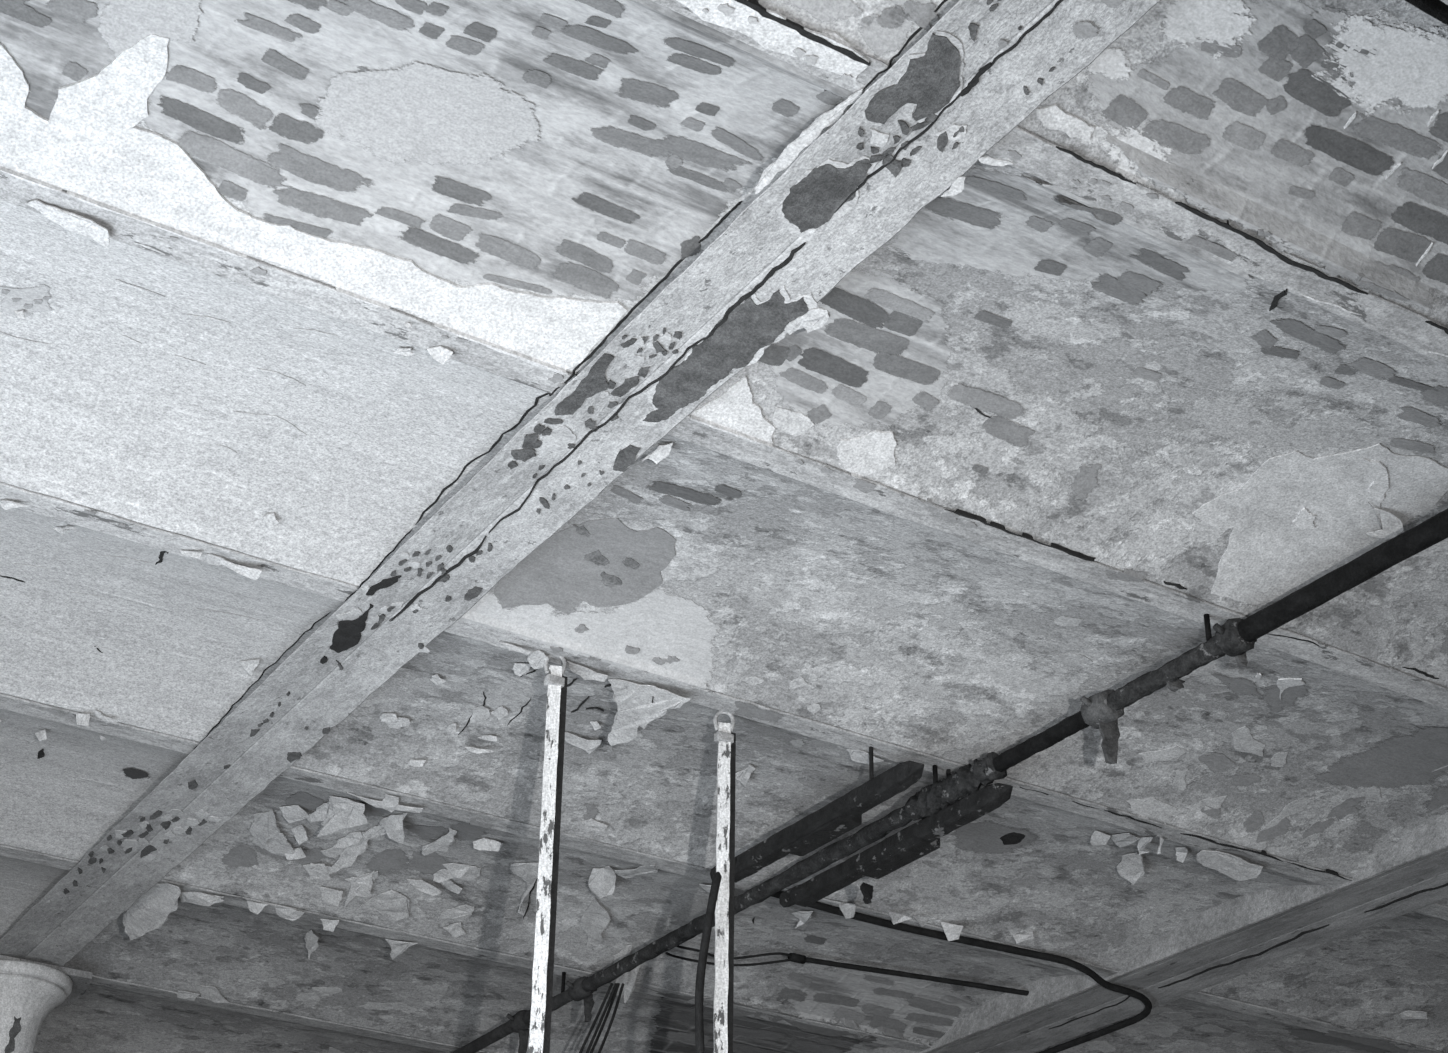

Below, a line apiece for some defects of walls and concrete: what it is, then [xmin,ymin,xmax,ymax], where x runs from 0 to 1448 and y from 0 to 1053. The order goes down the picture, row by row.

flaking render [0,0,115,119]
flaking render [138,0,854,301]
crack [735,0,948,90]
crack [835,0,1064,213]
flaking render [881,0,1448,315]
crack [1056,146,1368,295]
crack [194,201,742,749]
flaking render [494,518,676,633]
crack [391,242,806,621]
flaking render [758,268,1035,447]
crack [795,459,1187,590]
peeling [222,792,503,960]